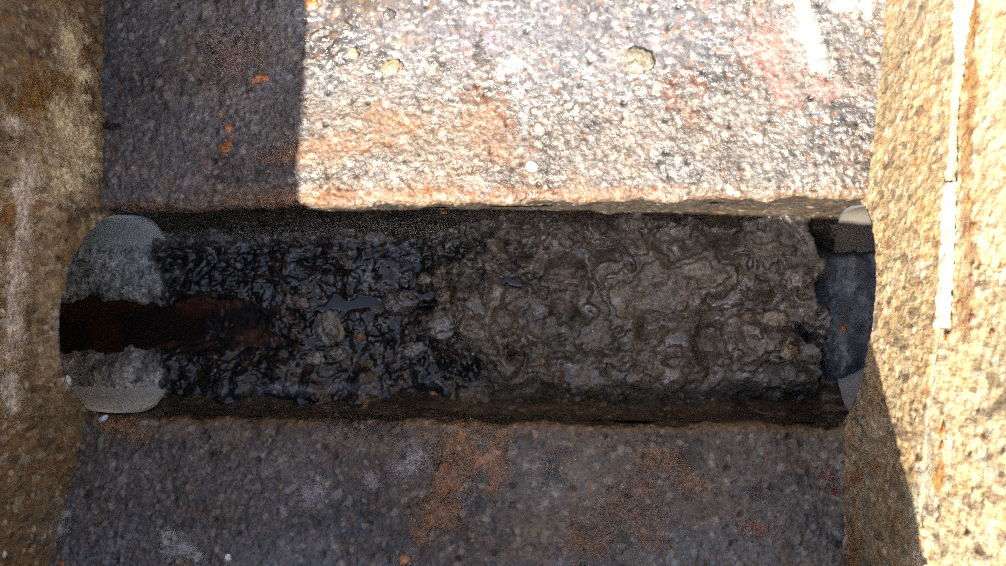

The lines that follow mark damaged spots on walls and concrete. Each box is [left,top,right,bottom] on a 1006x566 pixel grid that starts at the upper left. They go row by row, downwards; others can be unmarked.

rust [261,134,370,166]
rust [412,425,509,546]